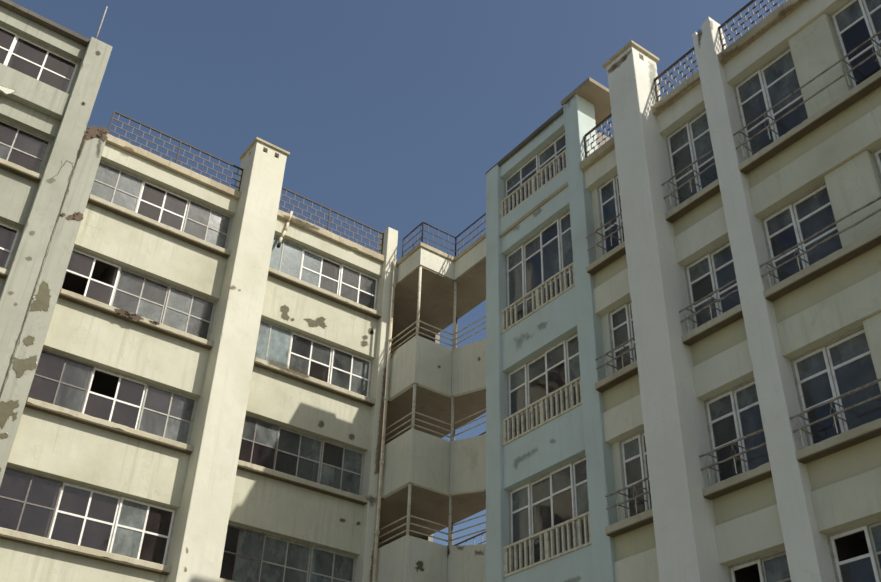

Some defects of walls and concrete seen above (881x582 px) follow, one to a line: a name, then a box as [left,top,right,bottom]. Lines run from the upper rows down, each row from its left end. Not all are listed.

spalling [84,126,108,142]
spalling [60,212,83,221]
crack [0,135,85,397]
peeling [30,281,51,312]
peeling [280,305,327,329]
peeling [12,355,37,378]
peeling [0,400,19,438]